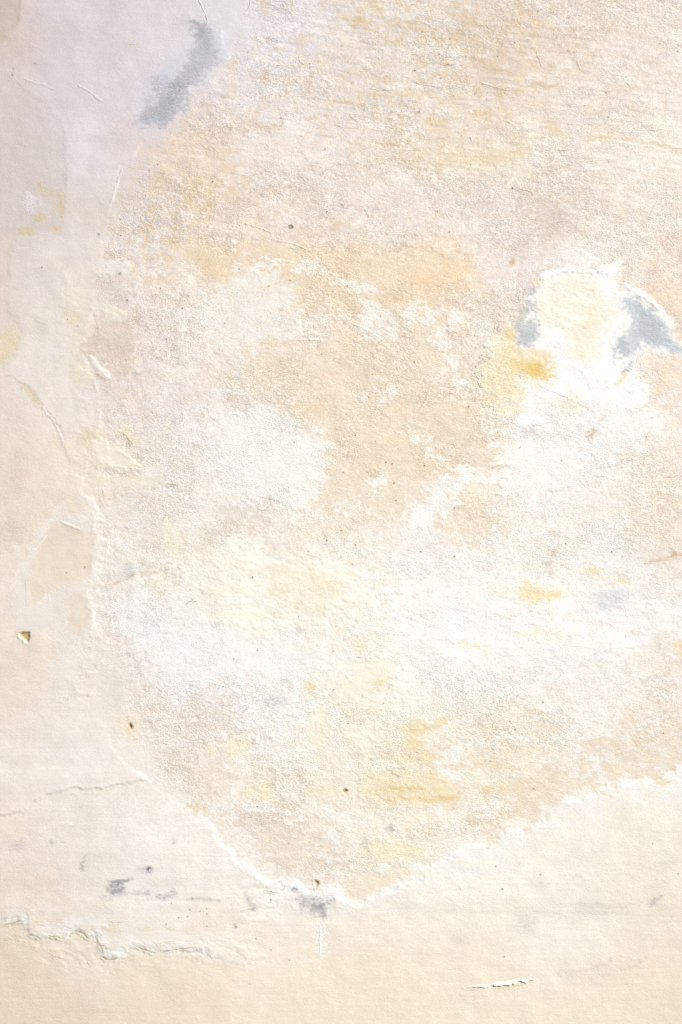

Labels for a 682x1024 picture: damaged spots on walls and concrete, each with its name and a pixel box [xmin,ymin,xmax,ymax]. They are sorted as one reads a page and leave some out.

damp [112,7,246,150]
peeling [0,0,267,466]
peeling [220,302,515,553]
damp [472,279,594,445]
peeling [595,257,682,328]
damp [608,293,682,387]
damp [260,561,350,640]
damp [481,577,568,653]
damp [113,713,147,746]
peeling [0,675,682,975]
damp [297,715,523,919]
peeling [462,978,534,992]